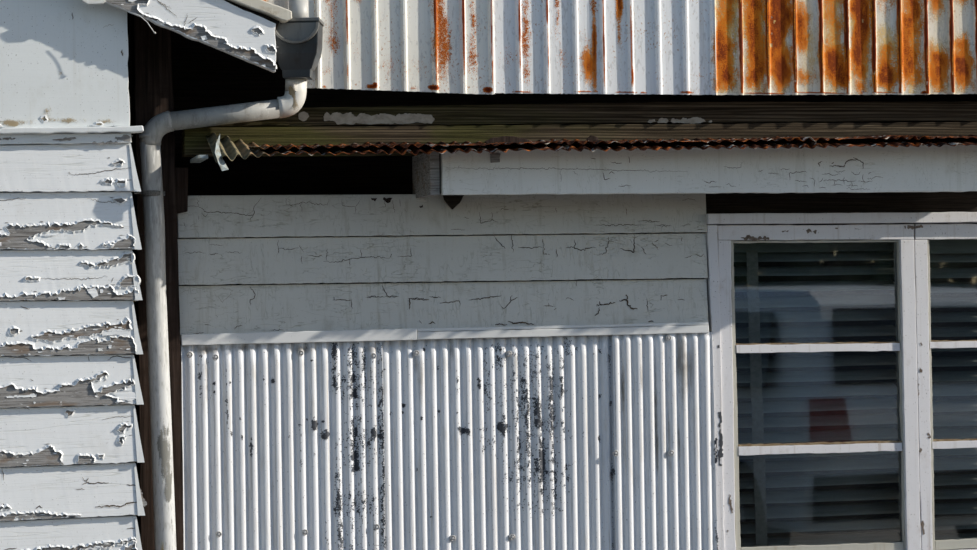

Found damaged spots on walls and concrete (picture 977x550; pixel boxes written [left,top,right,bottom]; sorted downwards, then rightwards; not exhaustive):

peeling [105,0,278,71]
rust [324,0,479,90]
rust [546,0,605,92]
rust [616,0,647,93]
rust [699,0,977,94]
crack [451,157,883,258]
peeling [0,218,147,300]
crack [277,240,411,264]
peeling [0,317,136,356]
crack [337,285,534,326]
crack [595,295,683,322]
peeling [0,371,136,418]